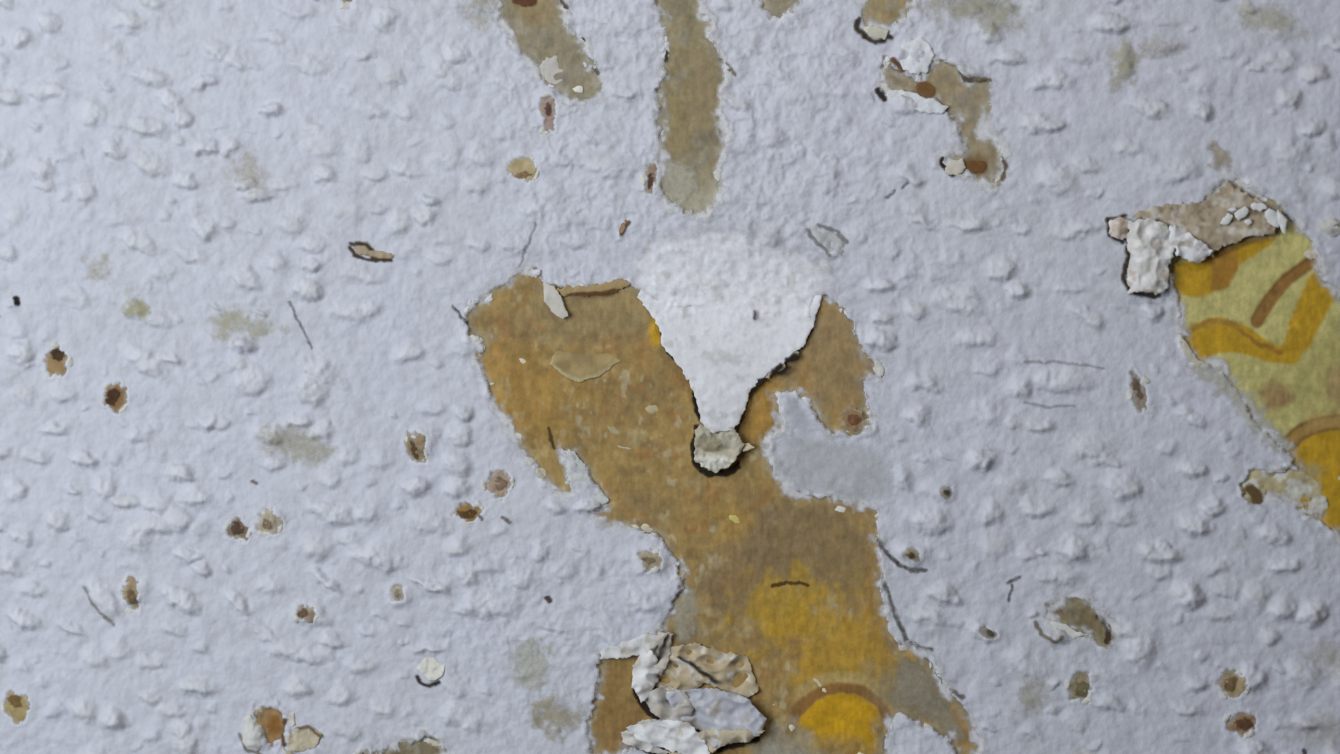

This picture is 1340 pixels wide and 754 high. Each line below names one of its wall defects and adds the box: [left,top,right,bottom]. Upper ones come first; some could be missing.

peeling [854,0,1012,196]
peeling [456,0,986,754]
peeling [1105,169,1340,549]
peeling [1034,592,1121,649]
spalling [238,705,323,754]
peeling [354,733,456,754]